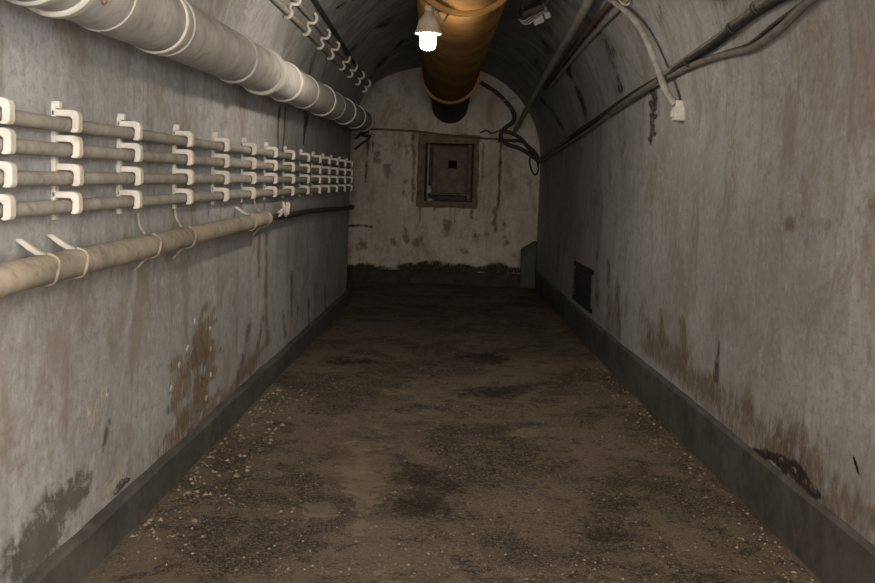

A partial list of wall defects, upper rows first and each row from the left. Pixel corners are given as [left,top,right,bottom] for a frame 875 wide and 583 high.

leakage [219,234,269,404]
leakage [347,260,520,274]
leakage [645,310,875,526]